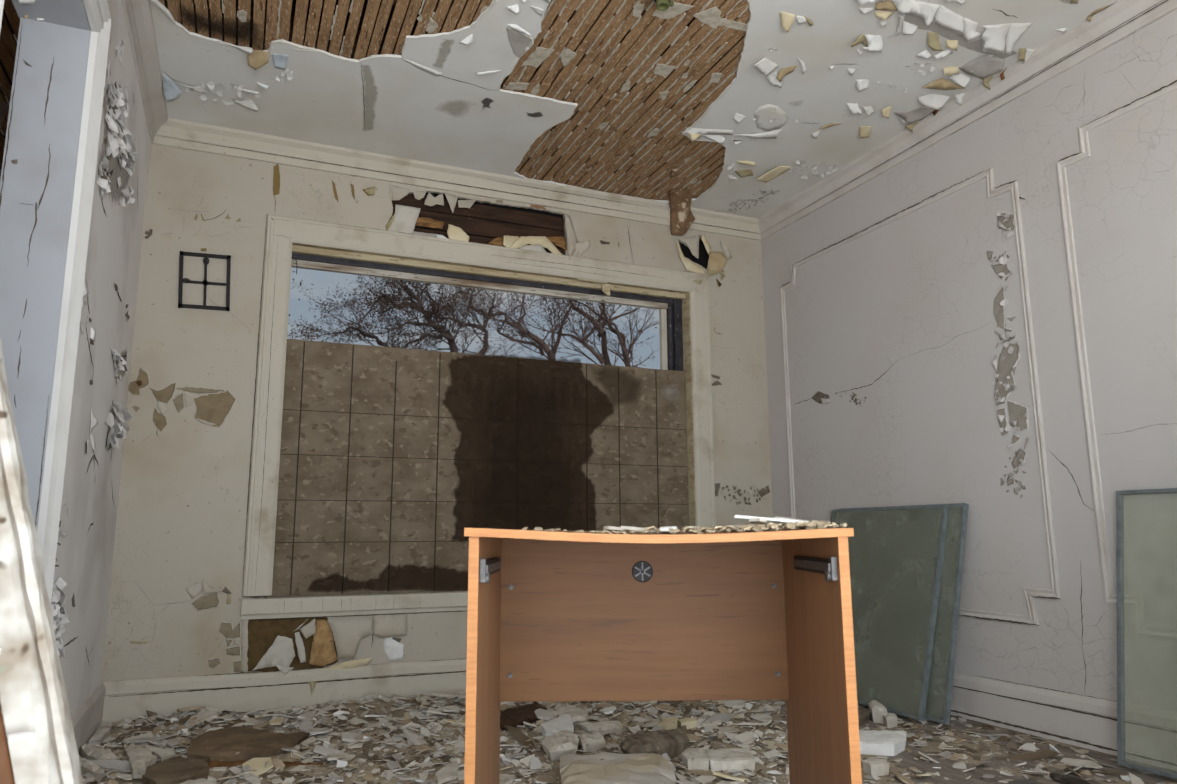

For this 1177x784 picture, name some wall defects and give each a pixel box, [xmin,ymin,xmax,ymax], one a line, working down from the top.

crack [0,29,54,267]
crack [131,4,661,278]
flaking render [157,0,837,213]
hole [679,239,709,269]
crack [782,167,1017,286]
peeling [829,0,1035,138]
crack [690,0,1177,234]
crack [35,397,49,526]
peeling [86,346,237,474]
leakage [443,355,613,541]
peeling [986,211,1030,498]
flaking render [207,614,408,674]